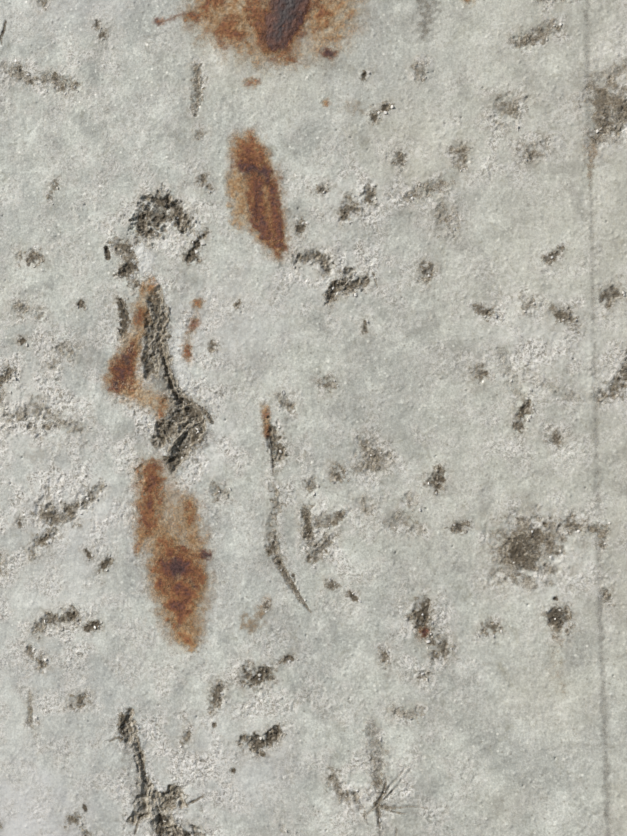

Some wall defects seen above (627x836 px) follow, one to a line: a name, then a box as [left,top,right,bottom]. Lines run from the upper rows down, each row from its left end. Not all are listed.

rust [155,0,357,66]
rust [226,131,287,259]
rust [106,278,169,419]
rust [133,458,211,653]